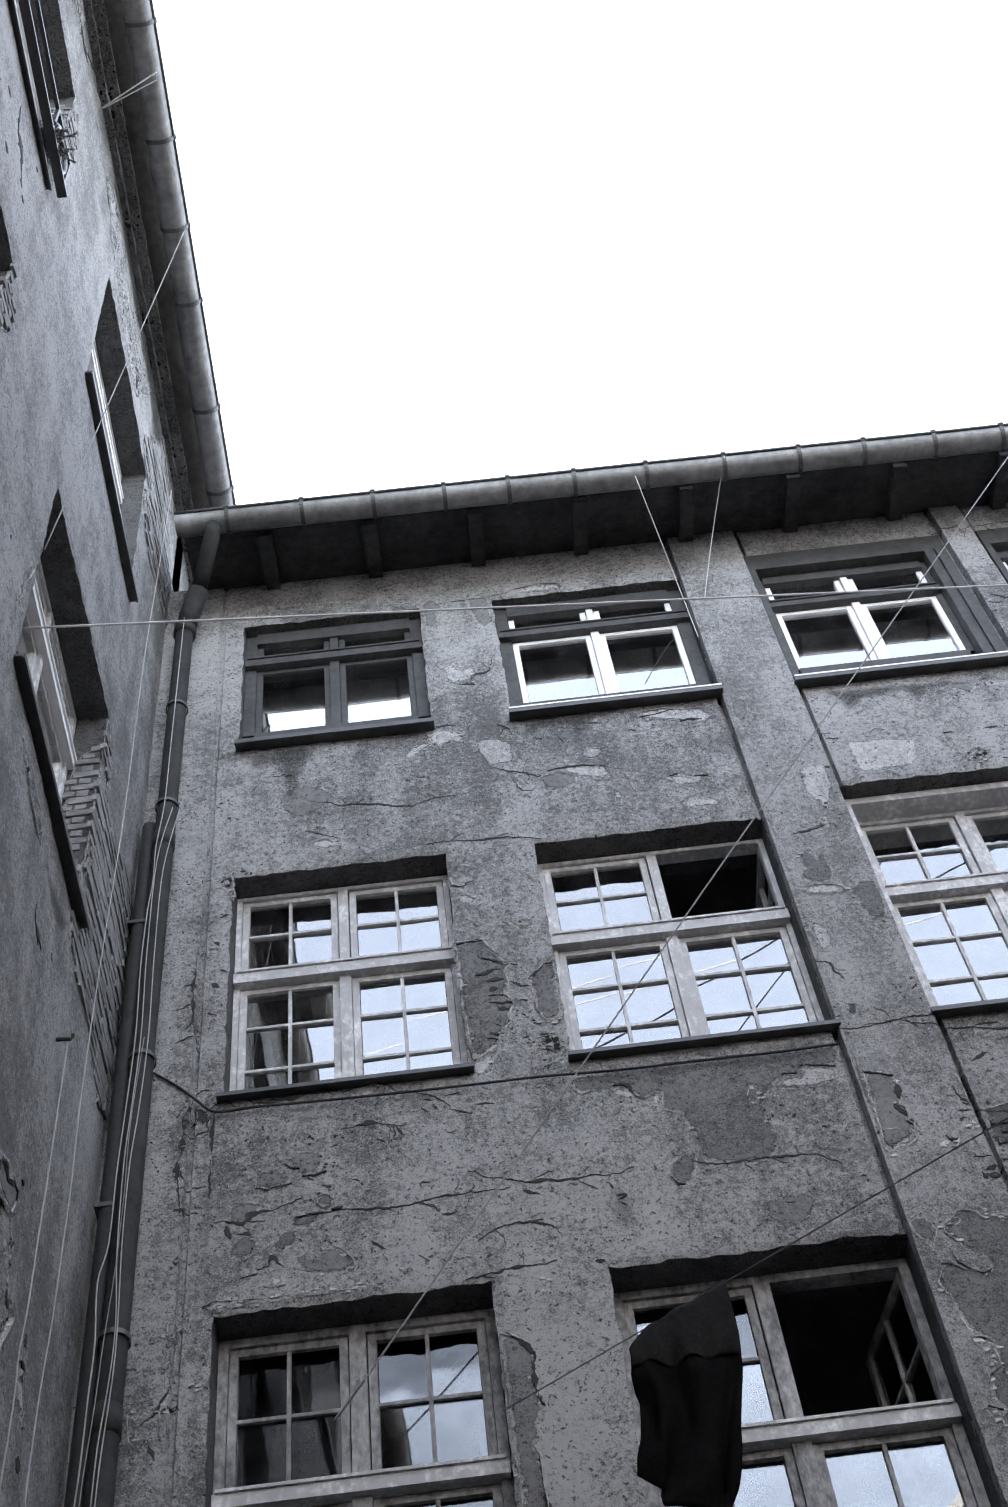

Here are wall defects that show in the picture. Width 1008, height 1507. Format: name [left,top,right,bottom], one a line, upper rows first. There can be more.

peeling [805,921,834,952]
spalling [0,1147,25,1354]
crack [171,913,634,1280]
peeling [451,938,841,1188]
crack [684,1145,842,1172]
peeling [763,1190,819,1230]
spalling [860,1065,1008,1179]
spalling [908,1208,1008,1434]
spalling [499,1331,553,1507]